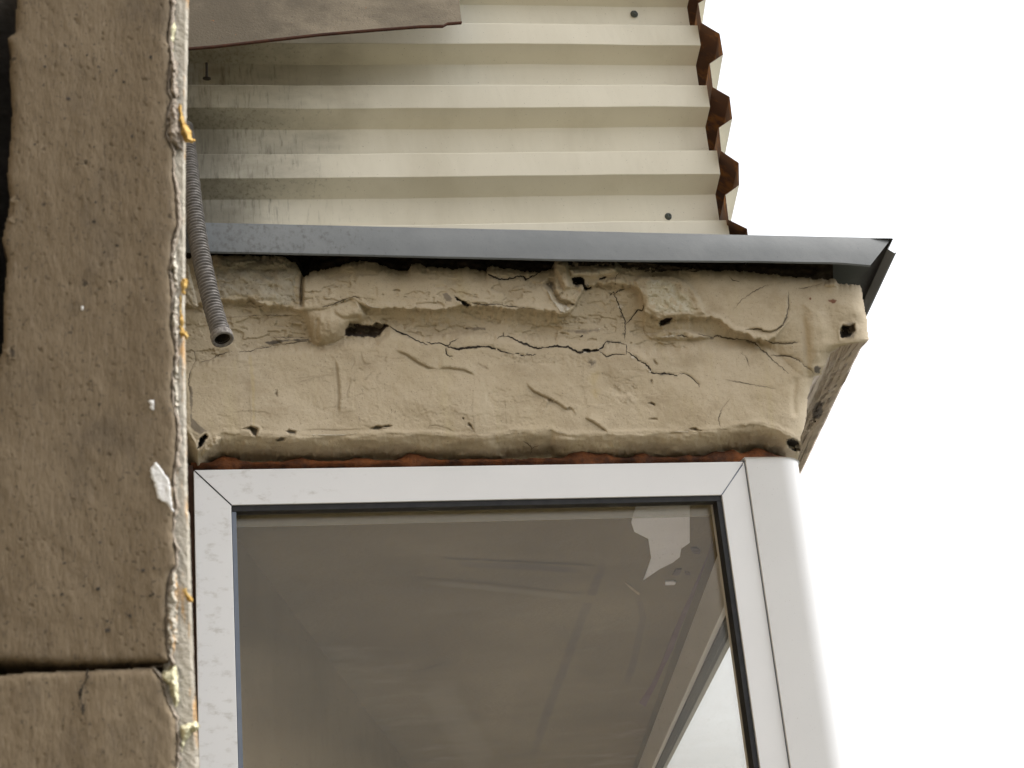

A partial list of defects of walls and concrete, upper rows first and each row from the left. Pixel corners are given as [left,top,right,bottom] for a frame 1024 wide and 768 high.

crack [188,315,307,386]
hole [345,323,389,338]
crack [390,270,698,384]
spalling [568,261,710,340]
crack [677,276,819,431]